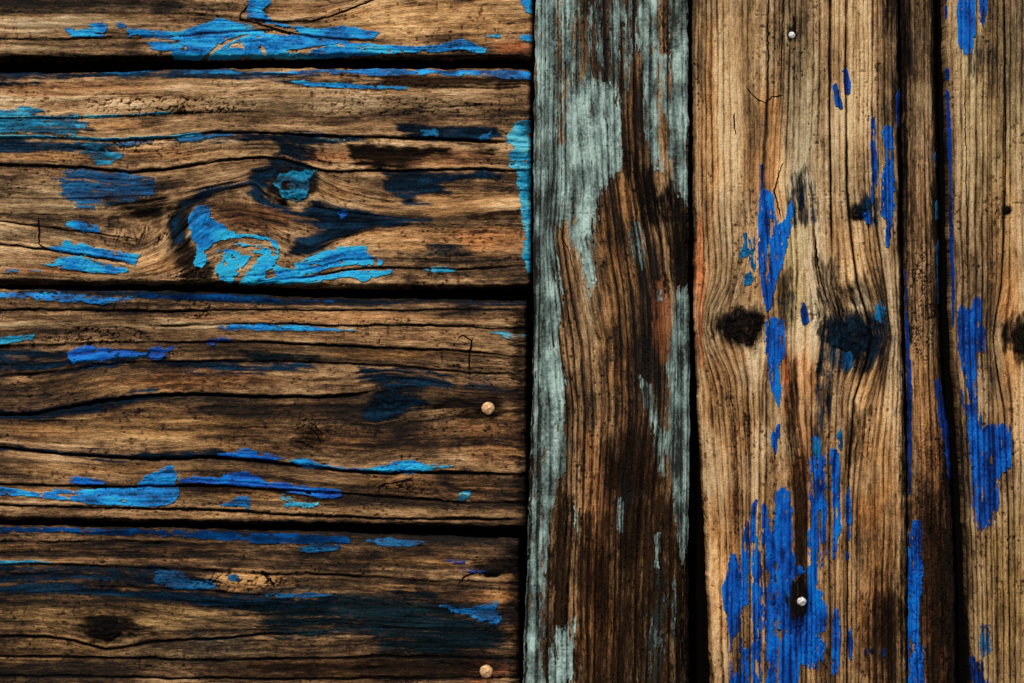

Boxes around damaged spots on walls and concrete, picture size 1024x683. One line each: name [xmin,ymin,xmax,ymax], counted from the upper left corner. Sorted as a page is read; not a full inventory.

peeling [944,0,988,55]
peeling [0,106,233,274]
peeling [0,205,392,305]
peeling [65,0,690,683]
peeling [737,164,793,406]
peeling [862,89,900,247]
peeling [934,68,1012,532]
peeling [0,465,342,511]
peeling [722,424,886,683]
peeling [907,519,925,683]